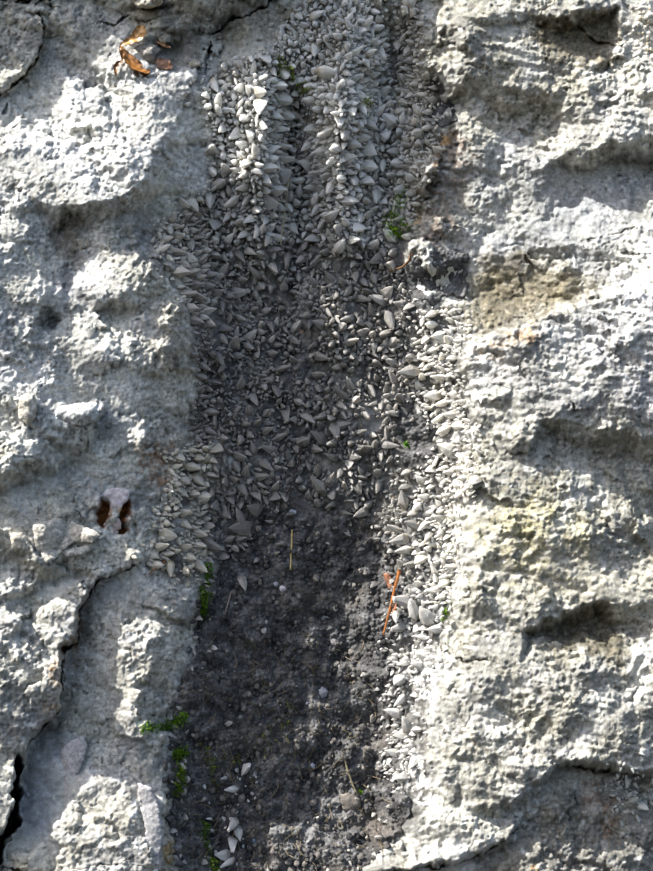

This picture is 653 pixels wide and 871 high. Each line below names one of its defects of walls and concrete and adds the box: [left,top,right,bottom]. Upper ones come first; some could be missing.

crack [0,564,135,871]
crack [572,765,639,777]
crack [393,828,524,871]